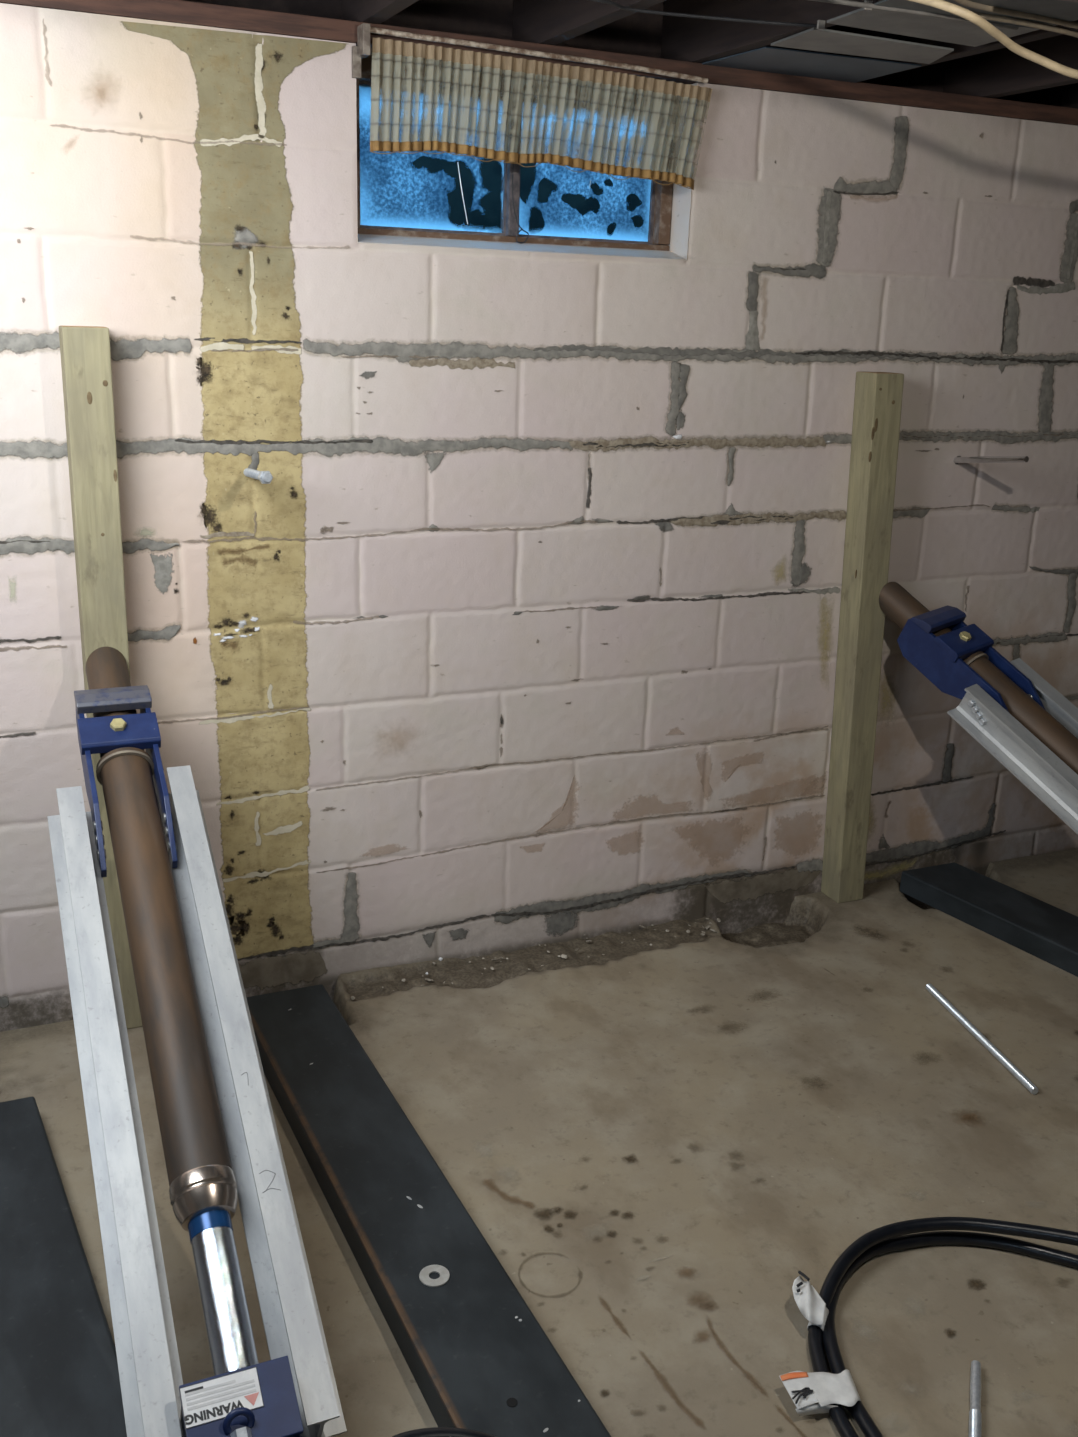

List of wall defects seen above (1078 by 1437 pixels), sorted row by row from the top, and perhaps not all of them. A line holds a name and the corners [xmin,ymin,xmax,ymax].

crack [0,332,60,354]
crack [110,116,1078,615]
crack [0,440,68,458]
crack [0,536,75,555]
crack [293,615,388,625]